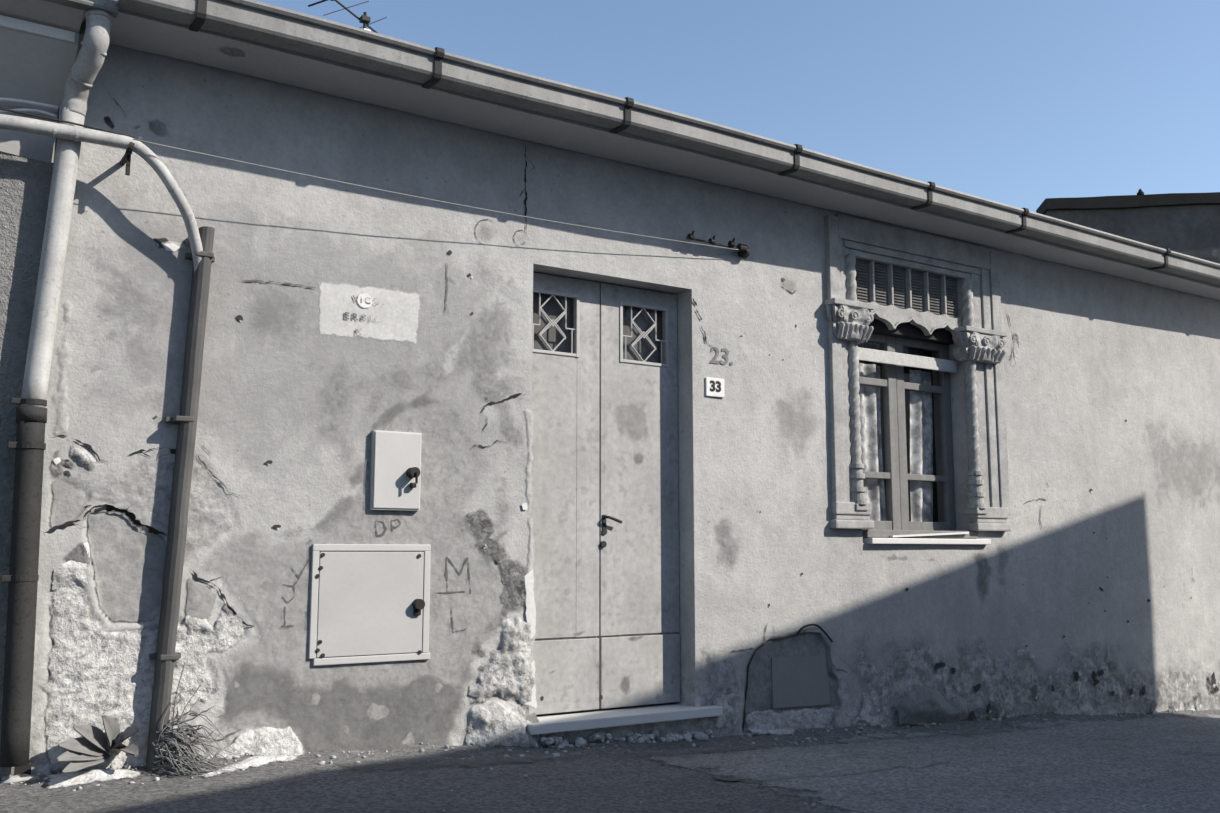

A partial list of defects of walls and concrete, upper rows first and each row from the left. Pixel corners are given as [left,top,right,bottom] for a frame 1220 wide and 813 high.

crack [519,147,535,235]
crack [470,393,525,450]
crack [51,503,166,535]
flaking render [91,449,176,526]
crack [57,434,246,499]
flaking render [186,463,231,555]
crack [193,571,254,627]
flaking render [461,410,537,708]
flaking render [43,542,158,773]
flaking render [168,612,246,727]
flaking render [852,635,1220,727]
flaking render [216,726,303,758]